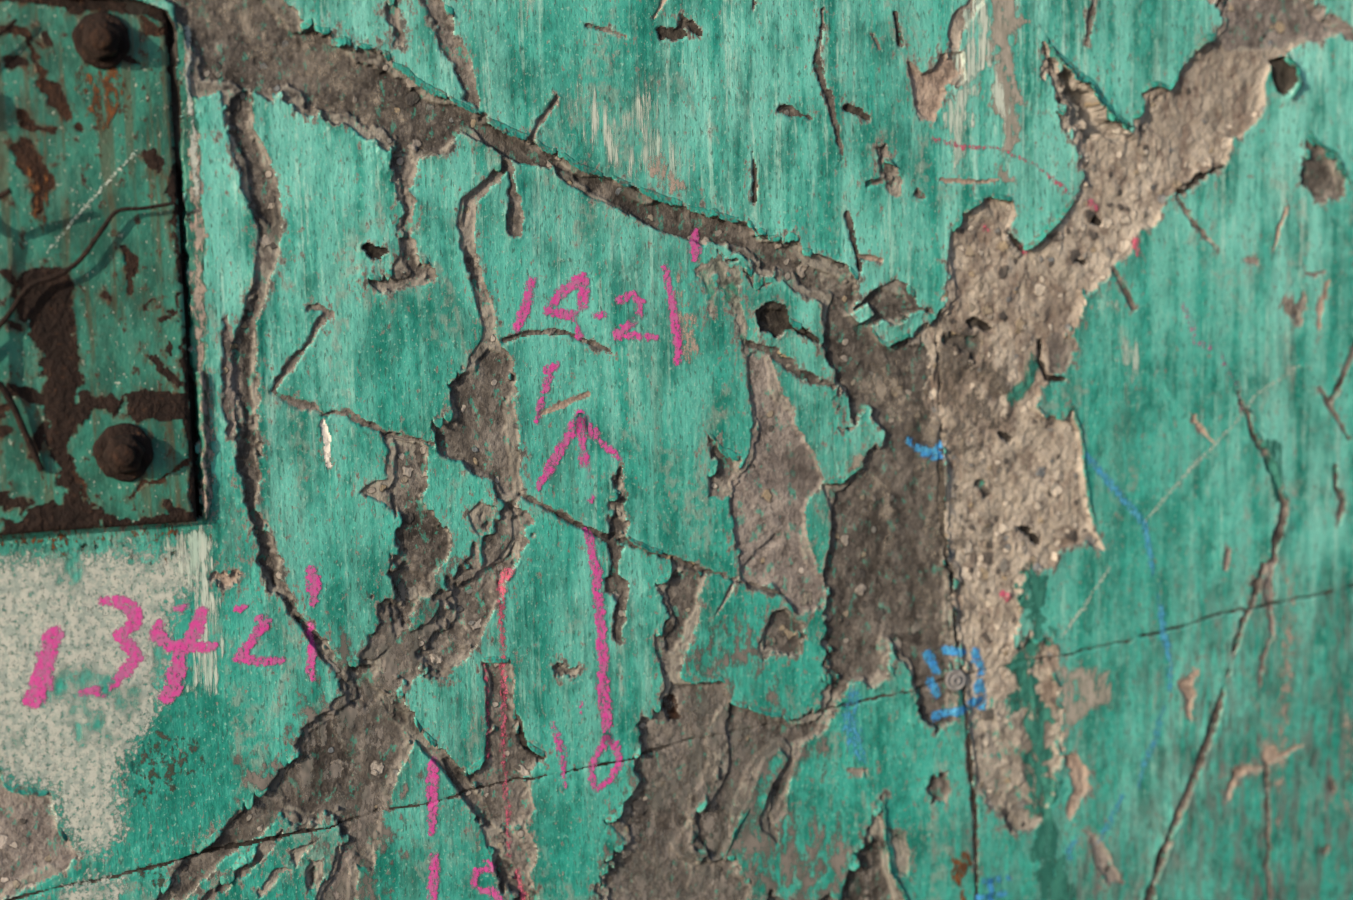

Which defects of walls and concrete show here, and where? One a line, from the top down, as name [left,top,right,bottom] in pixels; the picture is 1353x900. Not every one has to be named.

corrosion [0,25,141,234]
corrosion [0,0,170,75]
corrosion [0,146,212,560]
peeling [0,525,242,900]
peeling [156,433,452,900]
crack [423,0,488,121]
crack [5,88,1010,900]
peeling [166,0,859,687]
crack [813,7,843,160]
spalling [595,0,1339,900]
crack [1028,390,1353,900]
peeling [1300,130,1352,203]